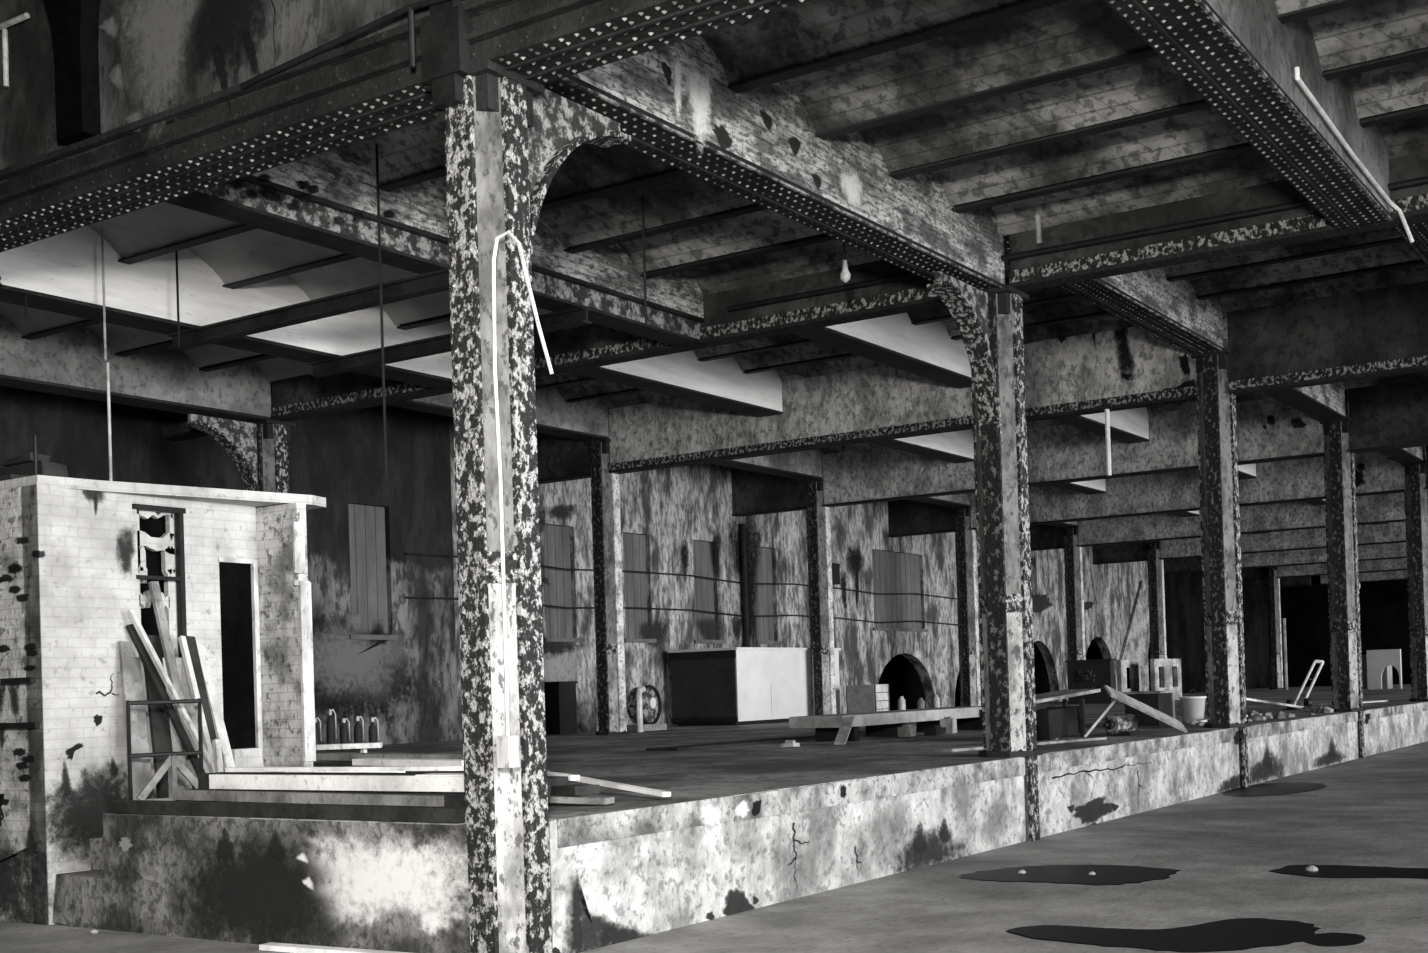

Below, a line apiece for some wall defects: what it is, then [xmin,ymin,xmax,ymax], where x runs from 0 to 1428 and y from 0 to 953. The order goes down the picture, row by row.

peeling [661,59,682,115]
spalling [760,110,772,130]
spalling [713,125,733,152]
spalling [789,137,801,155]
peeling [840,172,862,206]
spalling [0,537,45,602]
spalling [0,643,38,671]
spalling [13,748,35,782]
leakage [0,759,128,925]
leakage [898,819,965,872]
leakage [563,877,649,953]
spalling [707,889,759,920]